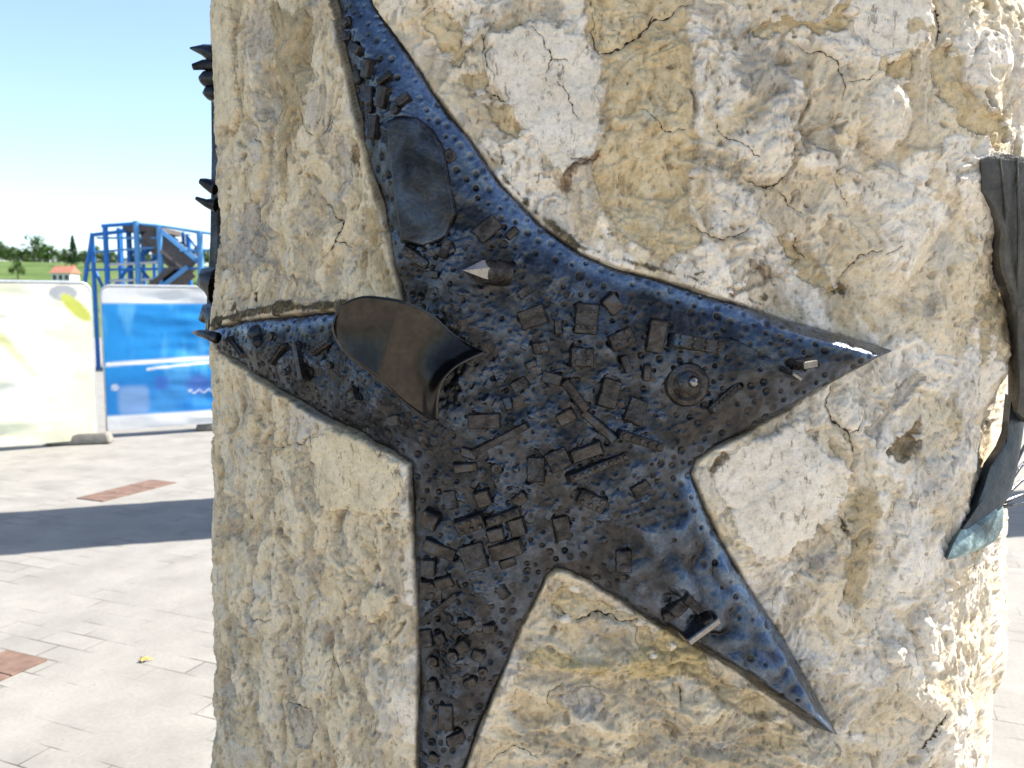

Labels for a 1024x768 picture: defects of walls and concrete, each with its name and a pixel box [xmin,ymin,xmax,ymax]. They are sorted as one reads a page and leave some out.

crack [590,4,690,54]
crack [532,26,578,118]
crack [798,46,881,98]
crack [745,172,802,214]
crack [825,383,863,476]